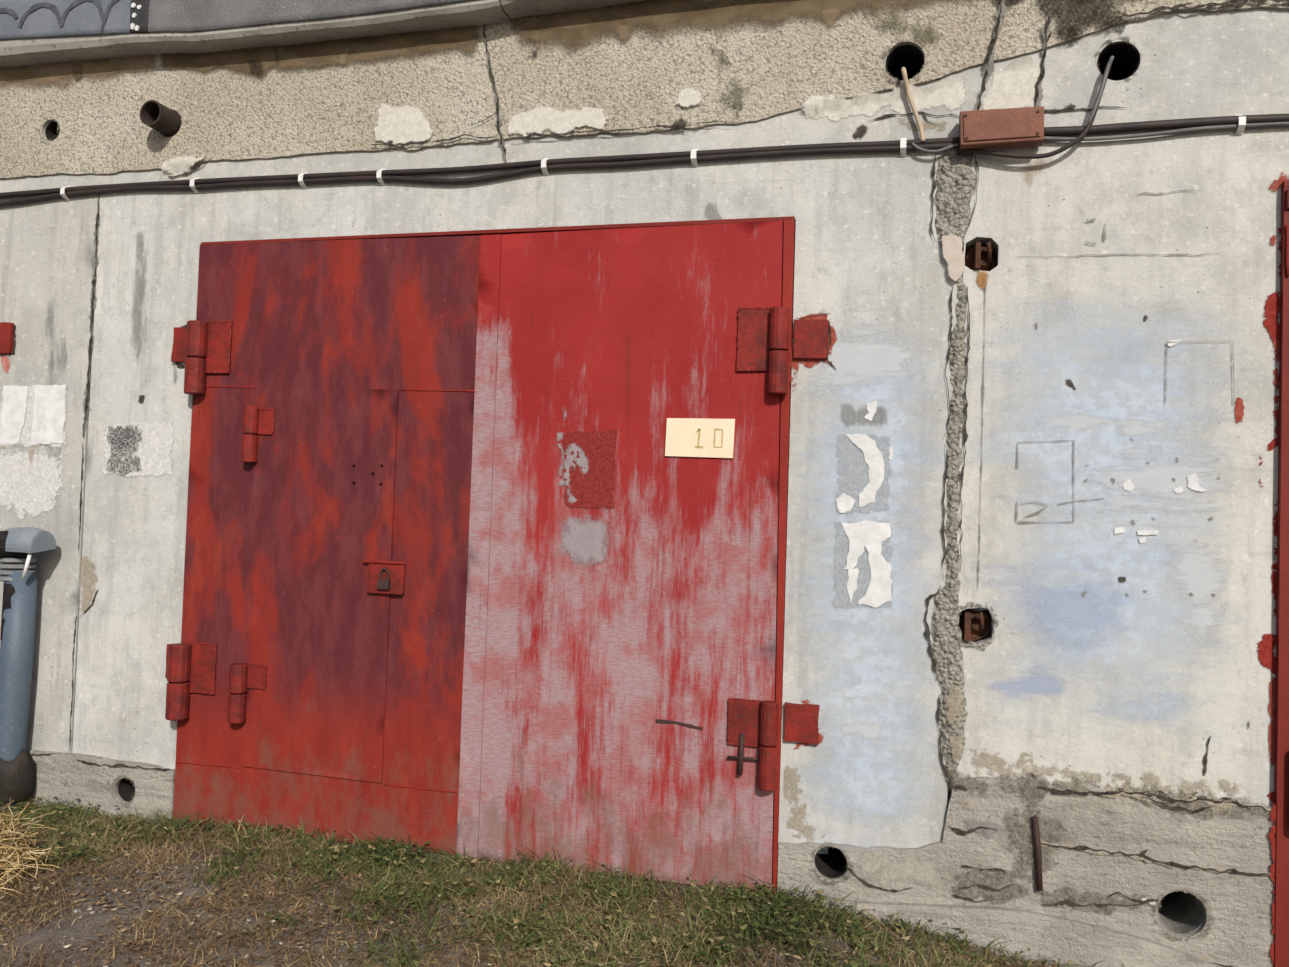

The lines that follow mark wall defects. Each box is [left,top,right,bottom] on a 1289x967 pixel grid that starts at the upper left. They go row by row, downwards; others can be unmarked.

peeling [371,102,432,146]
peeling [508,106,609,138]
crack [432,24,732,163]
leakage [511,0,933,48]
crack [869,0,1007,125]
crack [1033,13,1124,113]
leakage [1039,0,1128,46]
crack [1097,0,1289,28]
spalling [811,685,1271,941]
crack [1021,736,1271,876]
crack [845,866,911,893]
crack [948,825,1005,902]